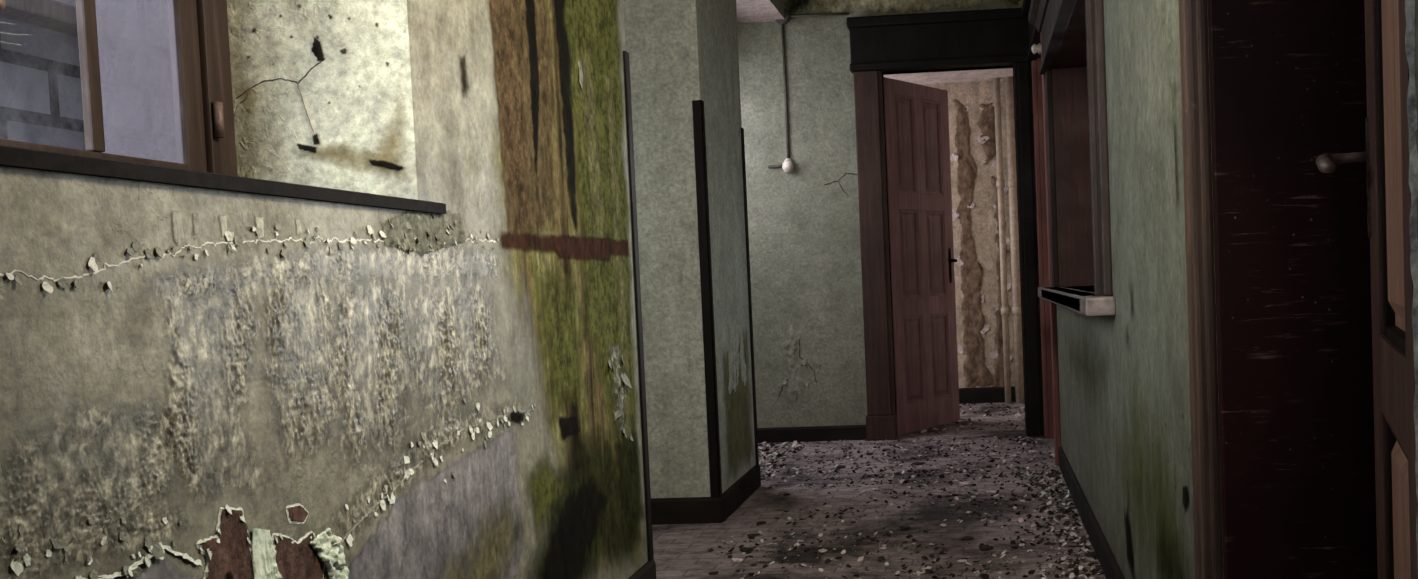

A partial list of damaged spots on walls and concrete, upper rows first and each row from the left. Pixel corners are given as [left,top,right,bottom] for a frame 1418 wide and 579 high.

crack [236,59,325,135]
water stain [460,58,469,94]
peeling [0,211,499,300]
water stain [490,0,643,579]
flaking render [950,99,1012,388]
flaking render [10,504,254,579]
peeling [272,397,536,579]
water stain [1124,485,1134,575]